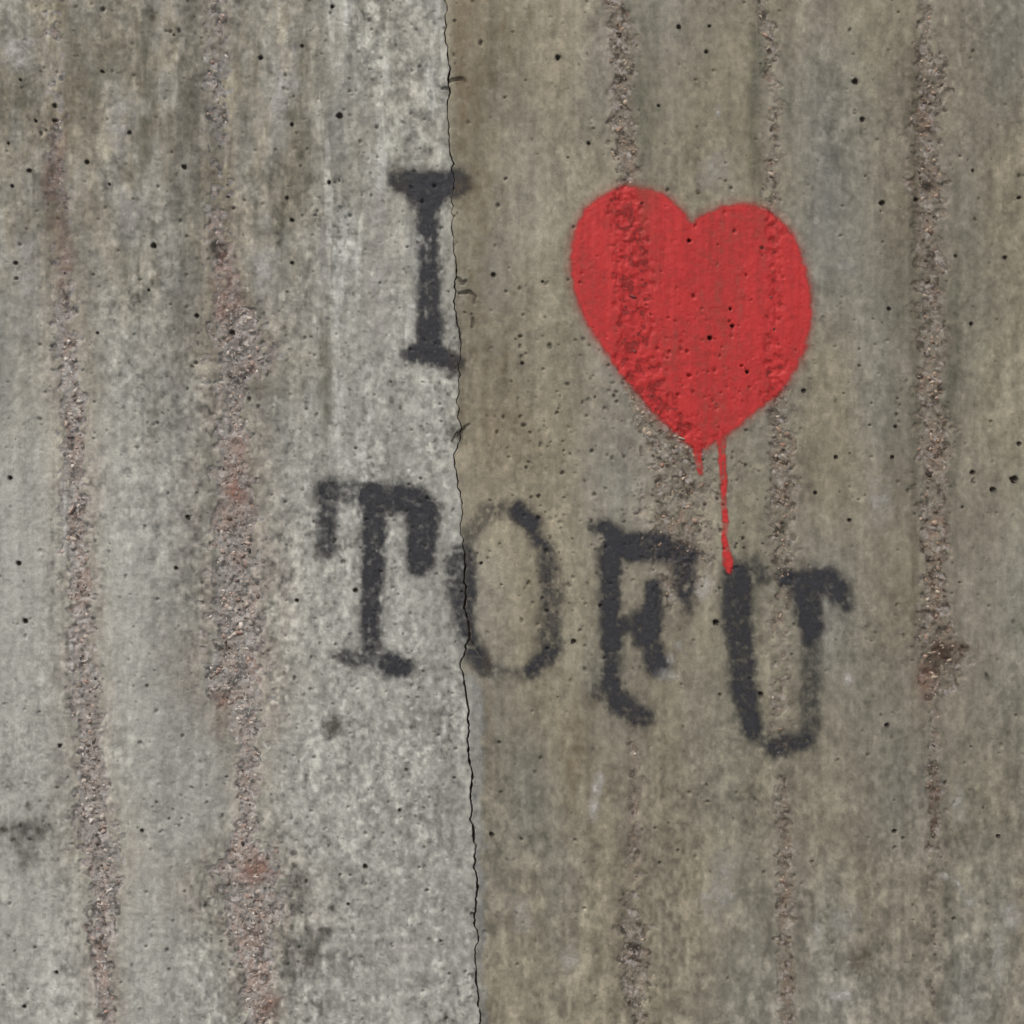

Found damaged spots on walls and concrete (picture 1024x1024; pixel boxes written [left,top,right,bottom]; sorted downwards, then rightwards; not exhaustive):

crack [442,0,482,1024]